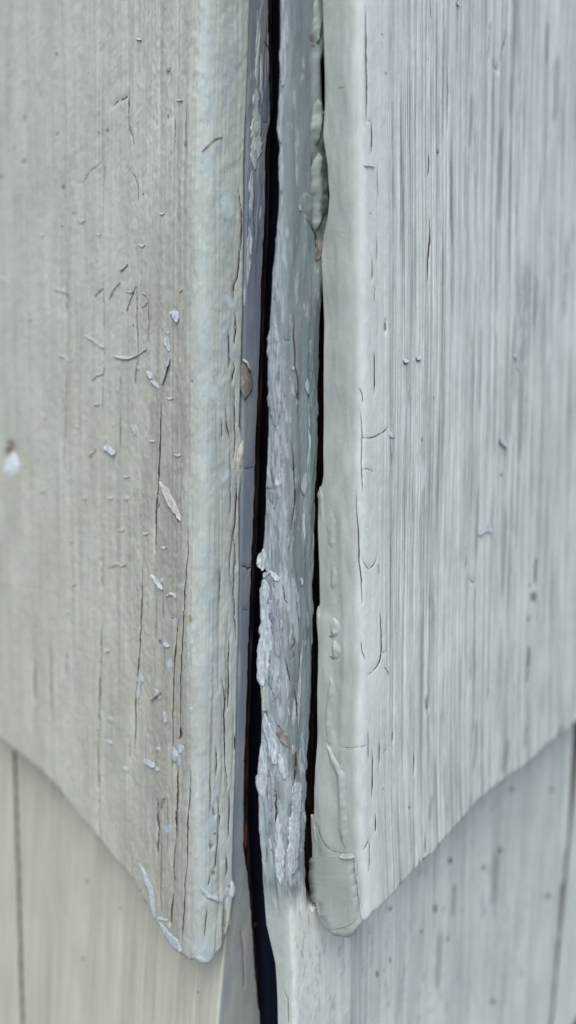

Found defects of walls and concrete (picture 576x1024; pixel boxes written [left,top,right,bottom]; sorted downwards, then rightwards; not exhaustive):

peeling [86,311,180,400]
peeling [159,481,181,522]
crack [356,354,392,592]
peeling [150,575,176,599]
crack [129,190,299,981]
crack [361,614,389,674]
peeling [143,744,184,771]
peeling [255,549,365,930]
peeling [139,863,182,952]